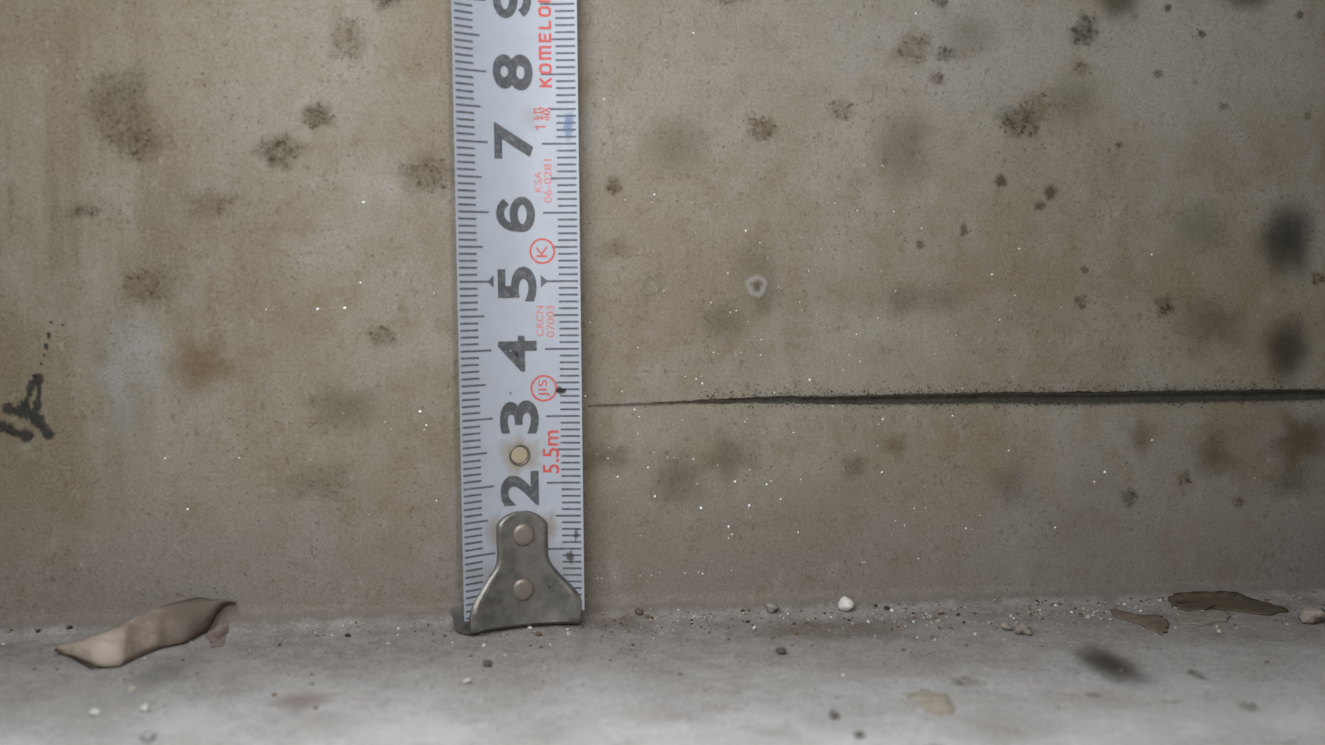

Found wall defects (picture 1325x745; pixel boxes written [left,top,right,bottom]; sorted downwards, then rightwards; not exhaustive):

damp [1269,217,1304,259]
crack [588,378,1325,411]